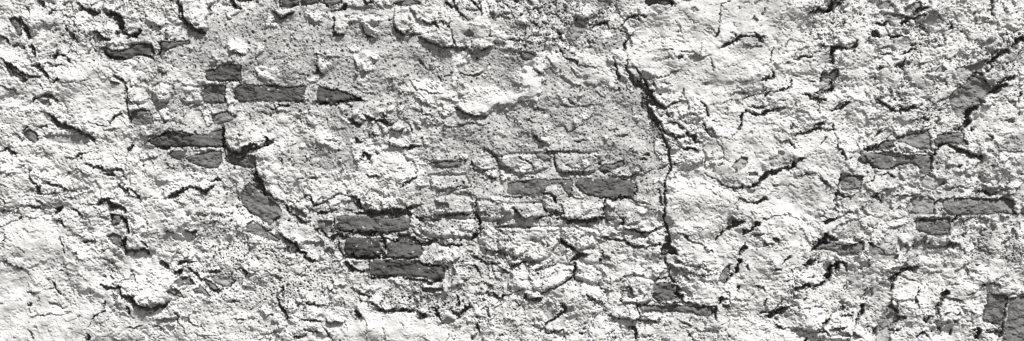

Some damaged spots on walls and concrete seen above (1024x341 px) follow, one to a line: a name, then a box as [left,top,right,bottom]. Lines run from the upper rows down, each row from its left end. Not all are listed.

crack [331,17,345,37]
crack [122,84,136,178]
spalling [0,0,792,341]
crack [473,200,482,231]
crack [601,0,793,285]
crack [817,102,887,221]
spalling [717,30,1024,341]
crack [1,236,78,341]
crack [85,310,107,341]
crack [491,247,612,330]
crack [628,304,641,341]
crack [894,287,925,316]